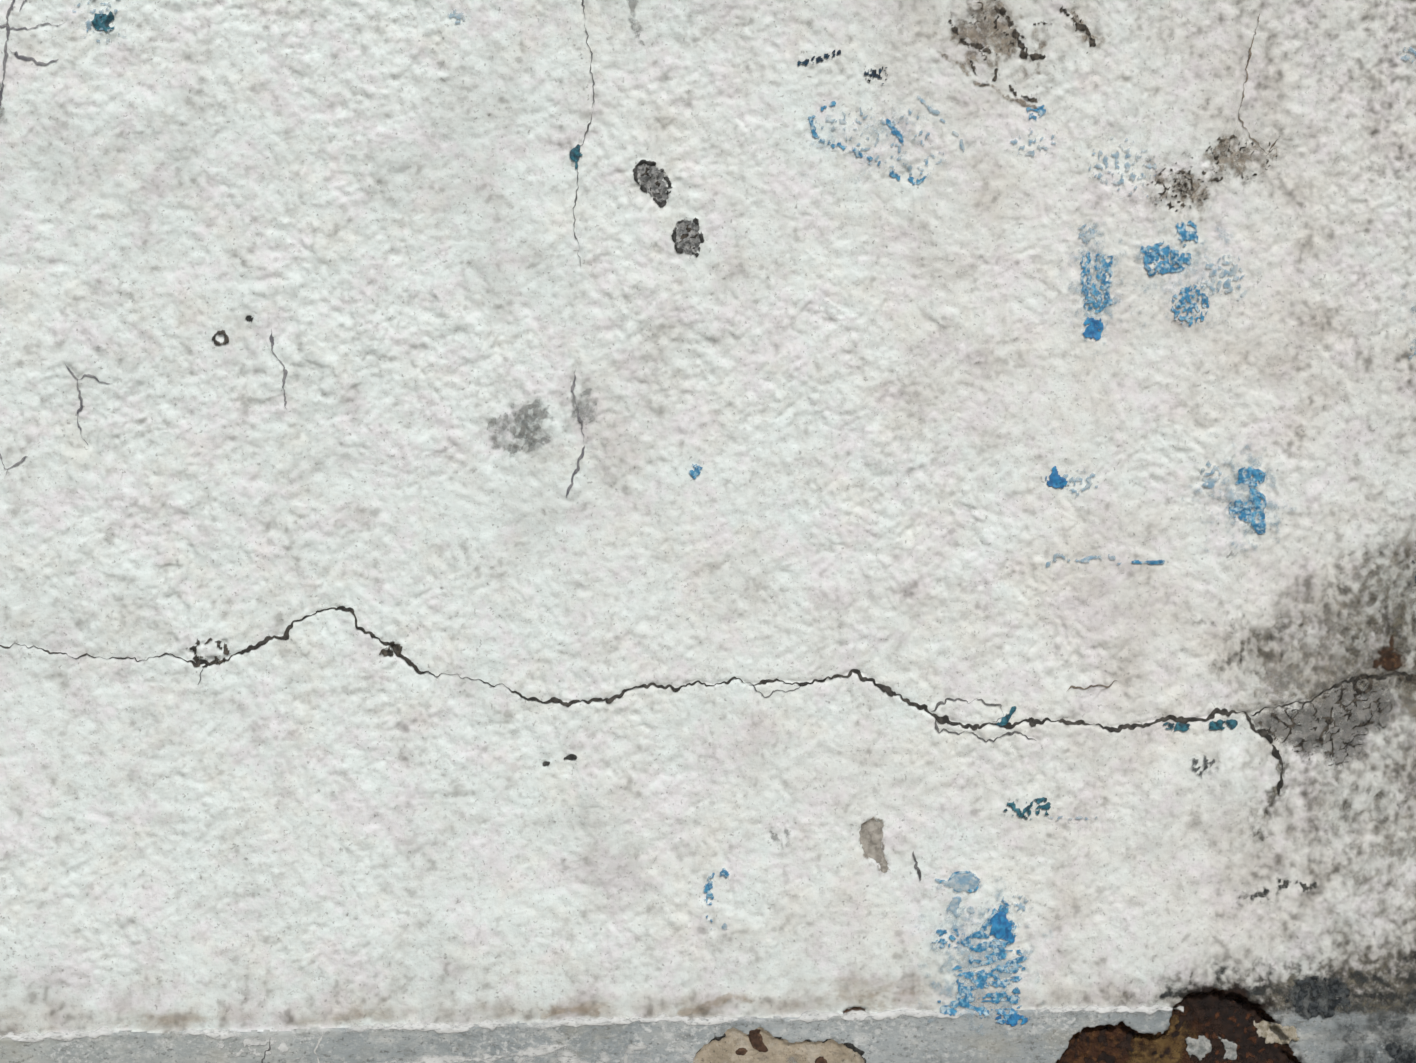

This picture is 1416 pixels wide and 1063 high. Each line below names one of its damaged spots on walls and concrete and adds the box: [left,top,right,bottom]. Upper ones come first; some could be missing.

crack [0,0,64,106]
spalling [633,160,672,208]
spalling [671,218,704,257]
peeling [1078,224,1113,314]
peeling [1140,135,1277,327]
peeling [1198,461,1267,534]
crack [0,606,1416,795]
spalling [859,817,888,873]
peeling [935,872,980,892]
peeling [938,897,1028,1026]
spalling [693,1027,866,1063]